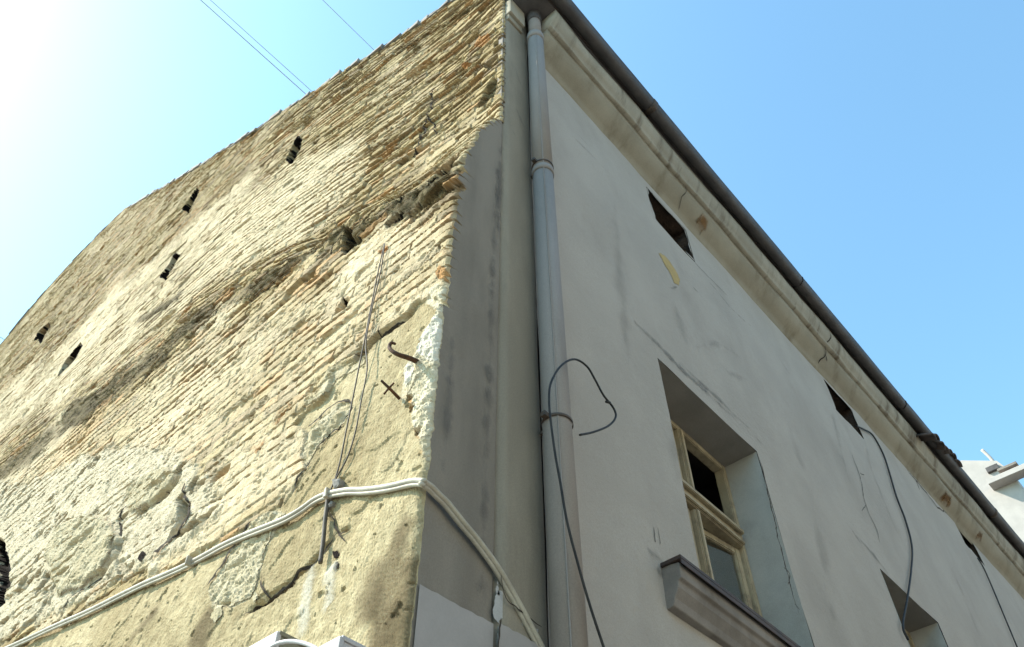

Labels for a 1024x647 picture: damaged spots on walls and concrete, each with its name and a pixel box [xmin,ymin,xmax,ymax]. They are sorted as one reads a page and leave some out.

spalling [401,265,452,470]
spalling [302,403,352,465]
spalling [207,512,282,622]
crack [243,502,347,615]
crack [758,456,799,609]